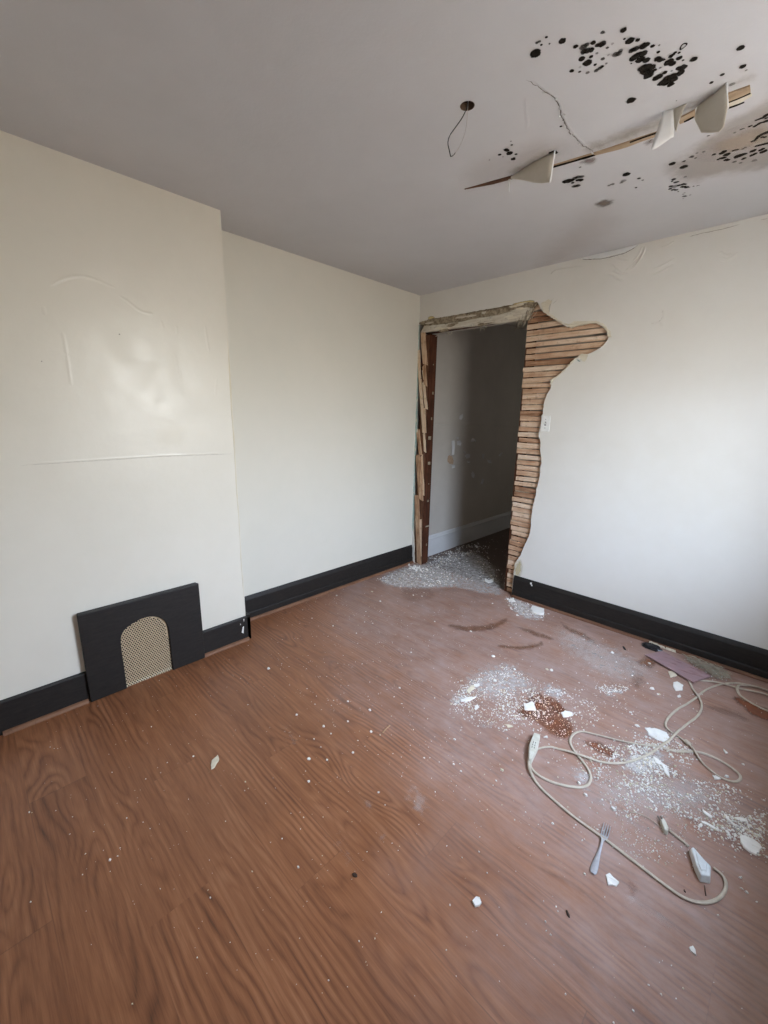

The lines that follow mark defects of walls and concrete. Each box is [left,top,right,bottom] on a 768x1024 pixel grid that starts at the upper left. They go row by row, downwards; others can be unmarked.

leakage [530,27,698,87]
crack [527,78,596,154]
leakage [712,113,768,161]
leakage [562,175,584,188]
leakage [668,156,699,197]
flaking render [500,299,611,592]